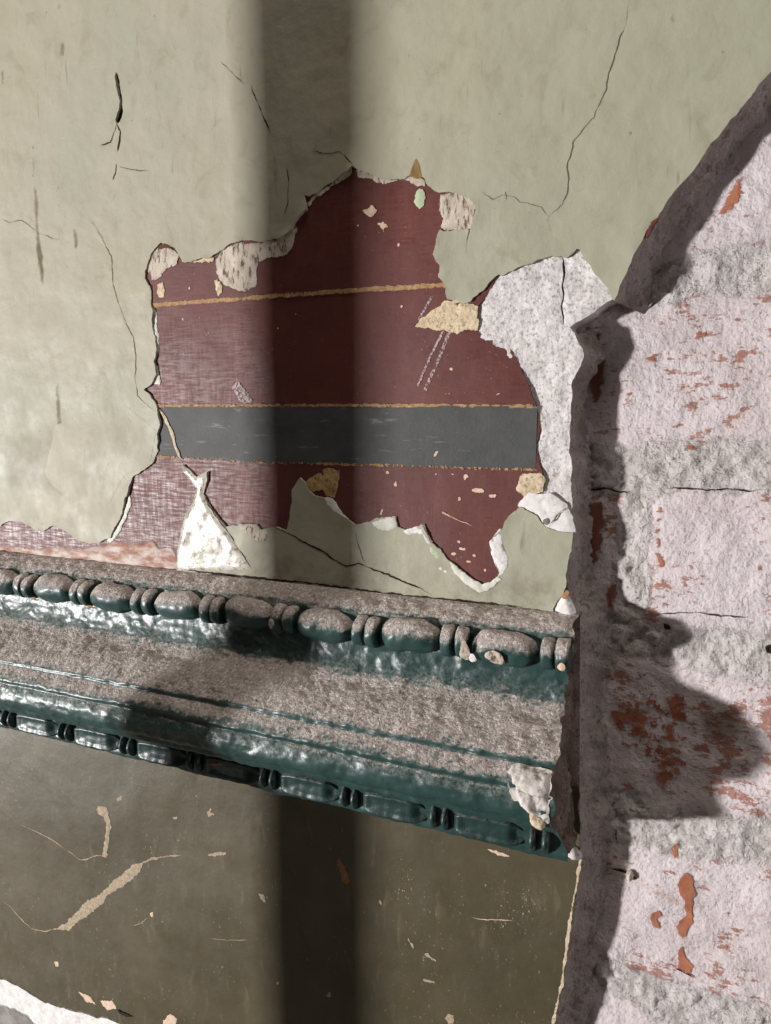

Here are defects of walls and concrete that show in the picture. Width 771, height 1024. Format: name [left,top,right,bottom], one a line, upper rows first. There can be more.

crack [102,76,147,179]
crack [485,8,628,222]
spalling [615,74,771,314]
crack [92,223,181,459]
crack [591,486,630,494]
crack [669,485,757,493]
peeling [655,504,664,582]
peeling [0,167,623,1024]
peeling [611,693,689,790]
peeling [650,911,662,929]
peeling [676,873,696,973]